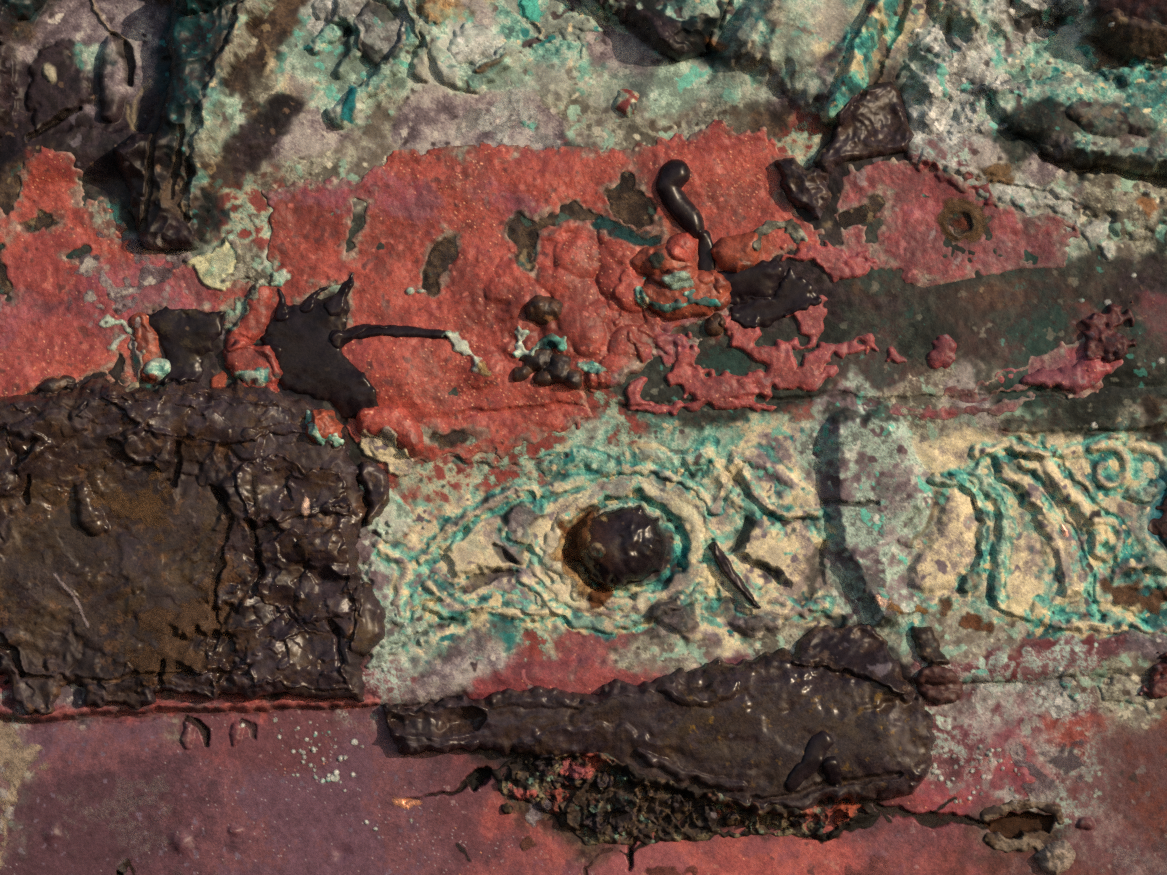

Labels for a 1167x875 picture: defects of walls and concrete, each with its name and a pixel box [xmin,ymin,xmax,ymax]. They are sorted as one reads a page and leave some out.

rust [938,198,986,242]
peeling [0,146,252,397]
peeling [258,119,1081,463]
peeling [889,335,1123,421]
rust [551,505,613,608]
crack [410,778,470,800]
crack [117,859,135,875]